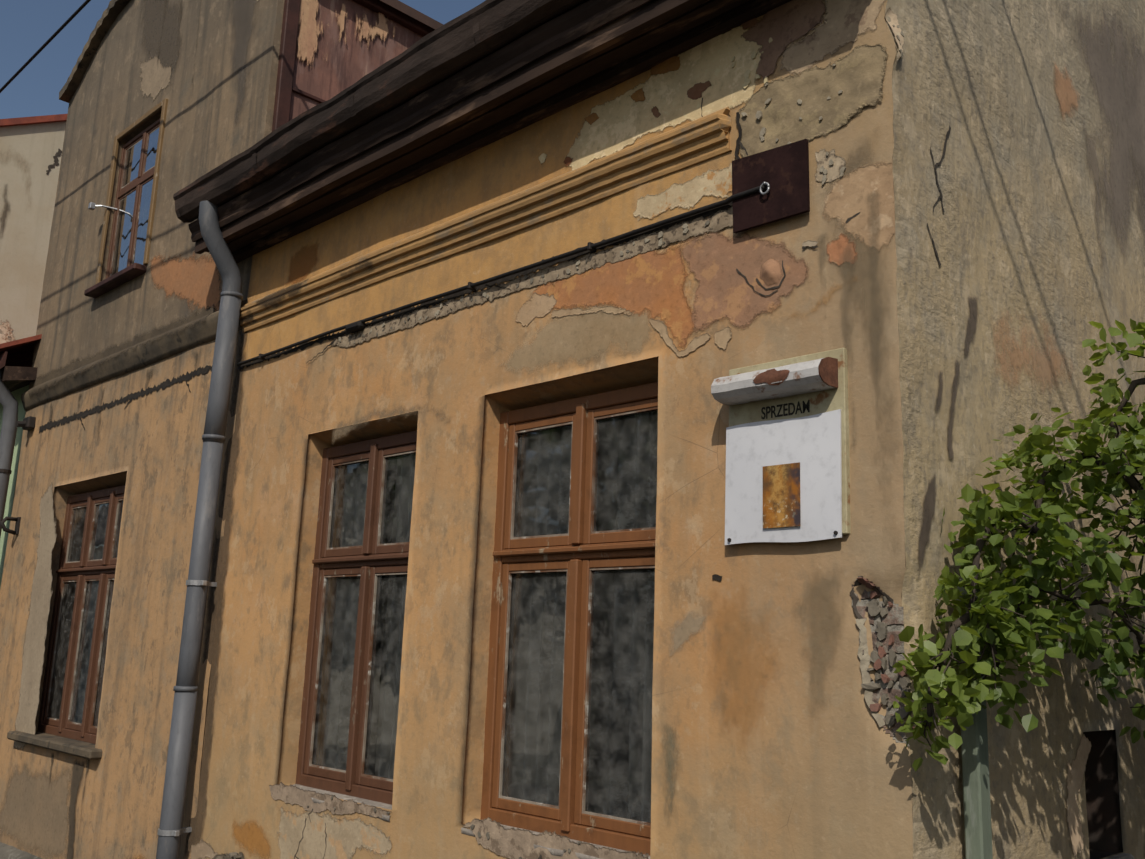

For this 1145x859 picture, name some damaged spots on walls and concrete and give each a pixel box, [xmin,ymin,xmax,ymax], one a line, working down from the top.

peeling [139,55,171,102]
water stain [1079,15,1145,250]
crack [46,149,62,175]
peeling [331,0,904,357]
crack [927,125,951,266]
peeling [151,255,221,311]
spalling [0,321,15,344]
spalling [850,576,915,747]
peeling [191,839,244,859]
peeling [277,806,392,859]
spalling [463,817,649,859]